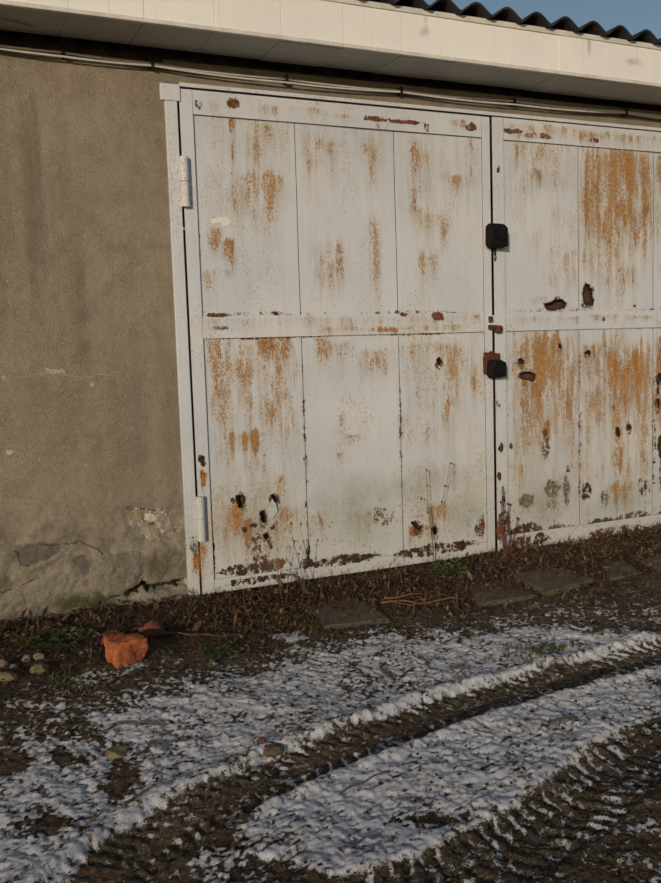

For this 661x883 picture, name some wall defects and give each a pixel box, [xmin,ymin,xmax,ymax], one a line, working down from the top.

rust [199,227,235,274]
rust [226,98,239,133]
rust [228,104,289,227]
rust [361,116,450,242]
rust [453,119,477,153]
rust [504,124,661,292]
rust [206,311,306,471]
rust [370,310,482,440]
rust [496,308,661,511]
spalling [126,505,183,541]
rust [198,455,207,488]
rust [222,475,325,572]